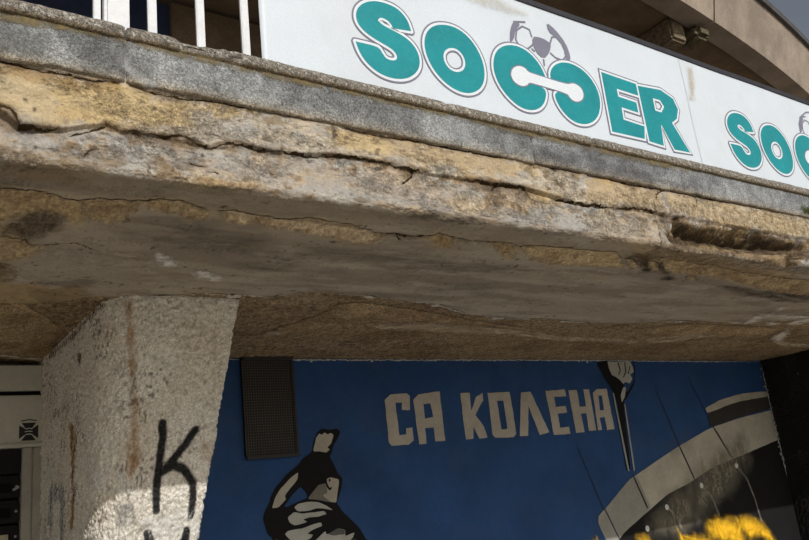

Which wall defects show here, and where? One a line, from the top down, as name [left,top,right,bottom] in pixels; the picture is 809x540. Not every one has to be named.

crack [0,60,249,109]
crack [0,105,420,184]
crack [352,130,505,159]
crack [464,179,525,191]
crack [555,178,754,220]
spalling [0,188,87,262]
spalling [217,206,383,245]
spalling [491,198,809,295]